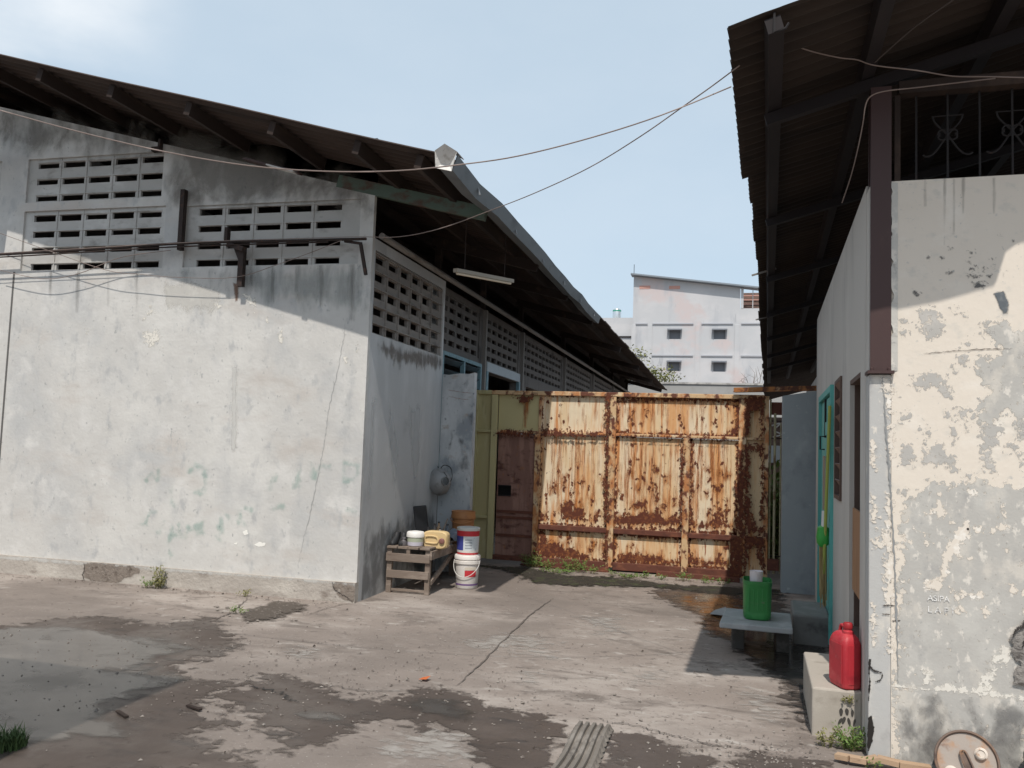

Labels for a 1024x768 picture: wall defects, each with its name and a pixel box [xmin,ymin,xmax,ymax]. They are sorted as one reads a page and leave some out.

corrosion [493,393,766,578]
peeling [868,305,1024,768]
leakage [0,616,568,768]